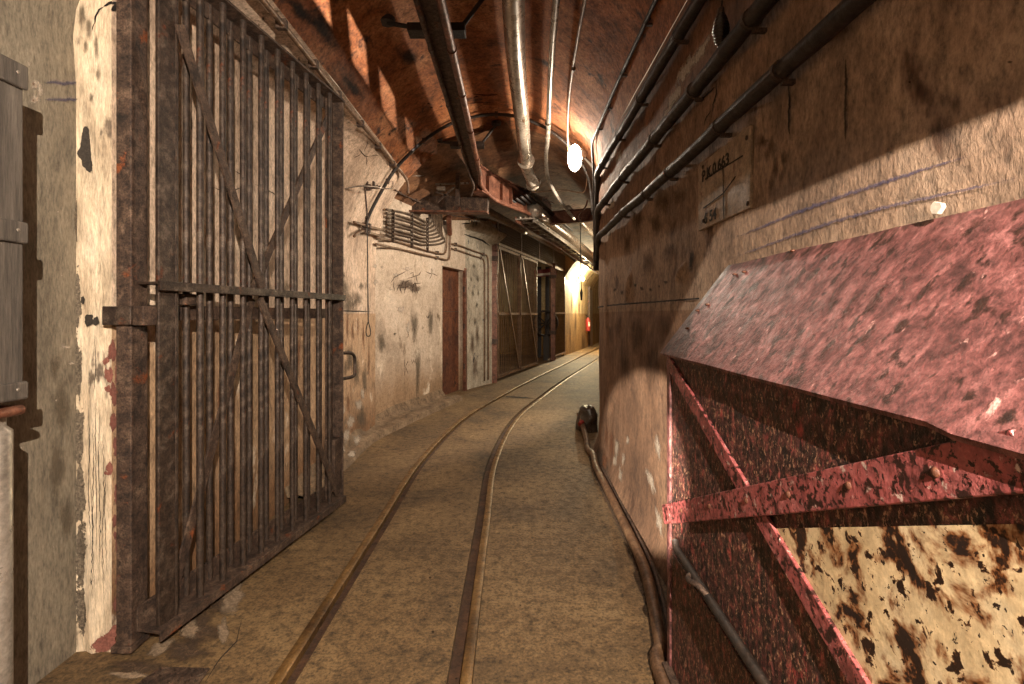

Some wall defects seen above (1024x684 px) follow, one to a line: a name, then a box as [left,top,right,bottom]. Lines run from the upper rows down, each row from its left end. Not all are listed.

flaking render [75,265,116,653]